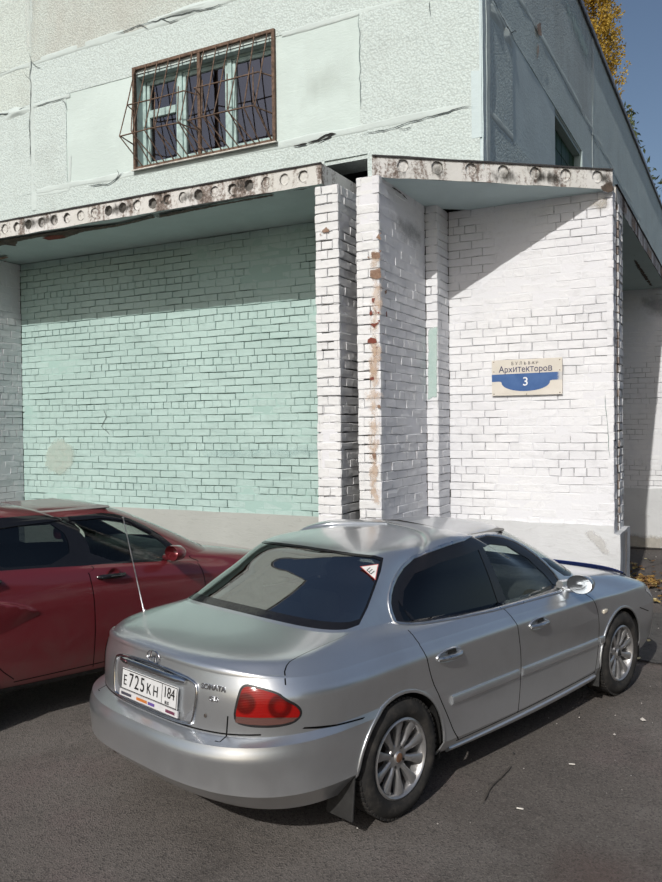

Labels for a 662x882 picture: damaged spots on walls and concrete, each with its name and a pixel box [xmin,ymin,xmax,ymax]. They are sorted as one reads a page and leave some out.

spalling [0,194,274,246]
corrosion [368,343,380,409]
corrosion [370,464,378,502]